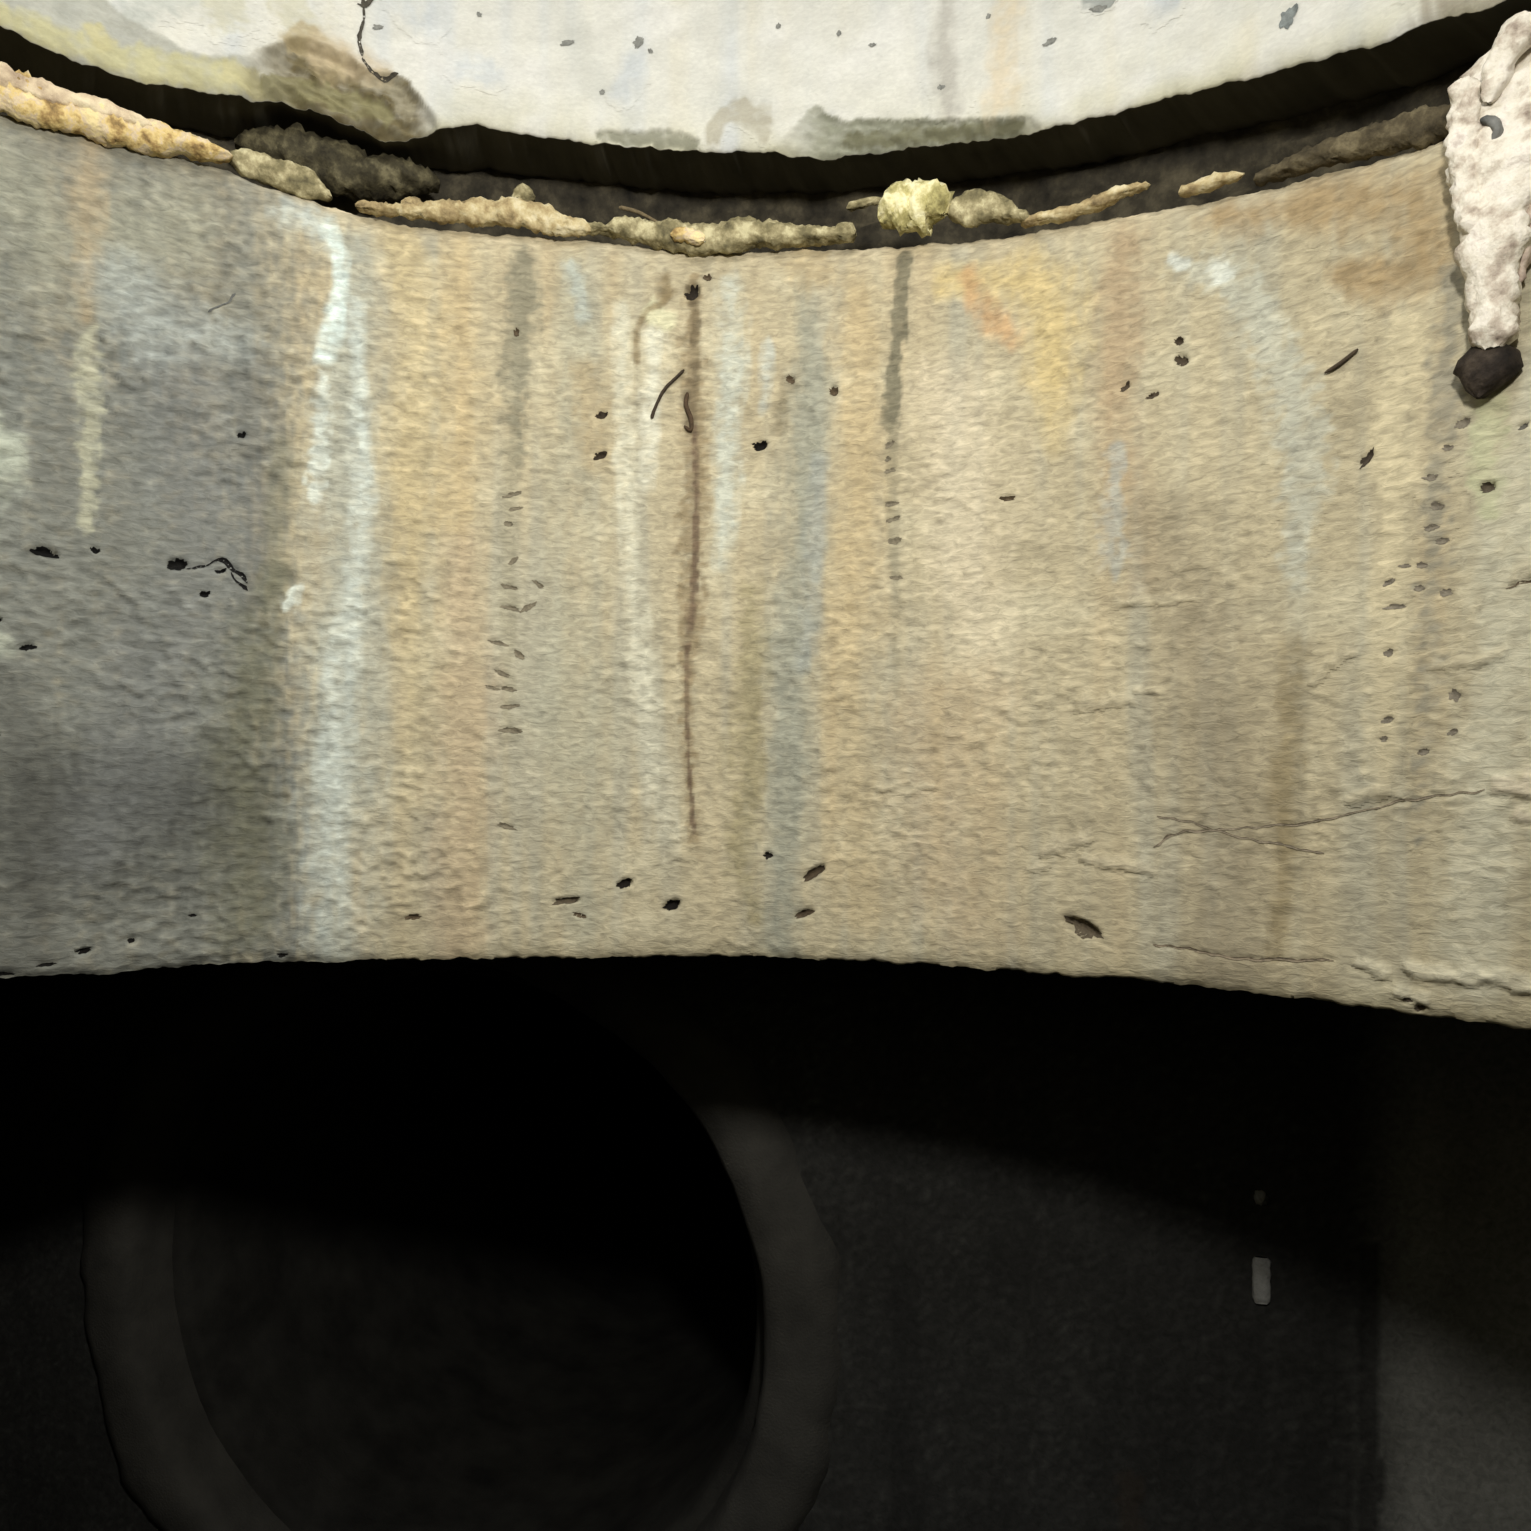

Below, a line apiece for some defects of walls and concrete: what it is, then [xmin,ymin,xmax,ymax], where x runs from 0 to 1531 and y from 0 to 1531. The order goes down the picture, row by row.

crack [357,0,398,83]
water stain [1390,0,1504,36]
peeling [0,0,440,203]
crack [1154,789,1485,853]
water stain [487,238,1531,1531]
crack [1153,944,1334,962]